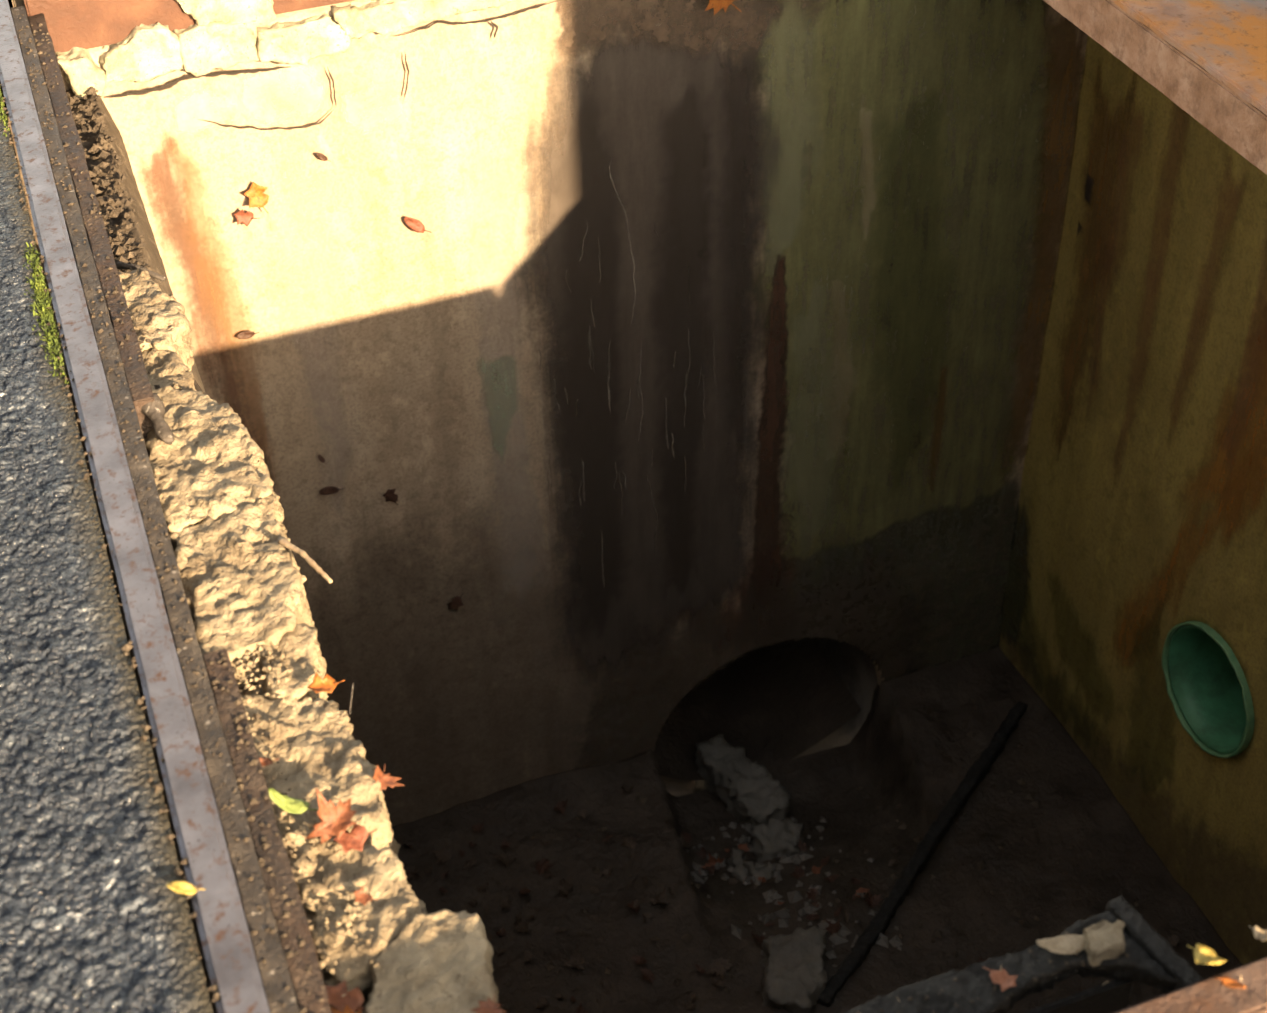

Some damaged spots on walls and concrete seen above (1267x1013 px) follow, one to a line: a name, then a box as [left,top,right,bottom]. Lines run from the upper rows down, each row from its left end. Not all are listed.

crack [103,67,291,98]
crack [198,66,336,130]
rust [720,255,795,634]
water stain [524,0,1030,770]
rust [1004,18,1085,466]